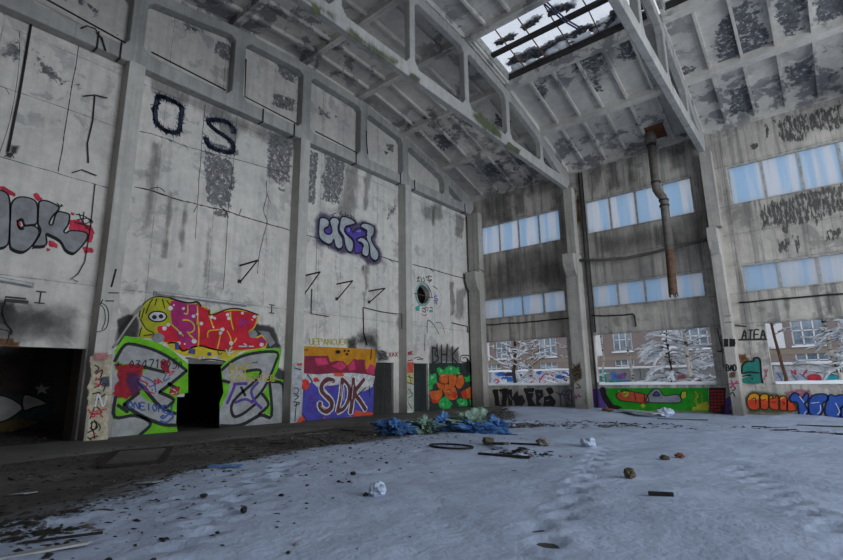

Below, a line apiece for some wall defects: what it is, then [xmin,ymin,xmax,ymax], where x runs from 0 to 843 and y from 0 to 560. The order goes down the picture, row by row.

peeling [711,0,772,62]
peeling [774,0,843,36]
peeling [729,85,756,116]
peeling [751,102,843,149]
peeling [784,62,813,87]
peeling [201,141,239,218]
peeling [265,130,294,192]
peeling [759,183,843,257]